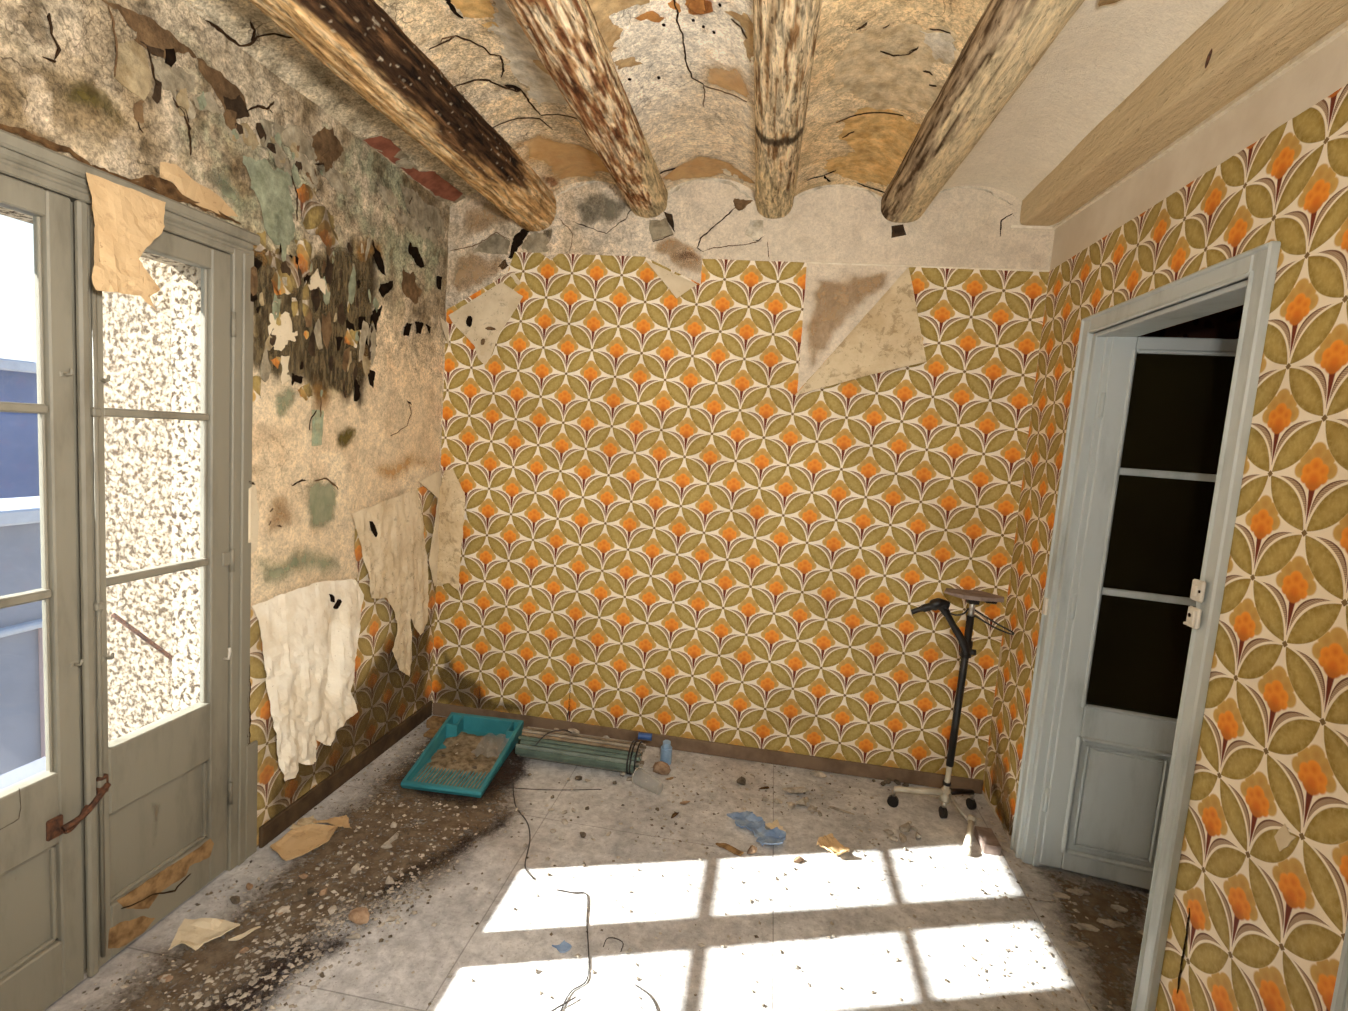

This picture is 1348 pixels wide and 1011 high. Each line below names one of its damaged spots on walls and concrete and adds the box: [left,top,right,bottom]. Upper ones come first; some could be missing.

crack [205,20,293,47]
crack [429,0,577,130]
crack [673,0,747,106]
peeling [102,0,355,246]
flaking render [359,134,465,203]